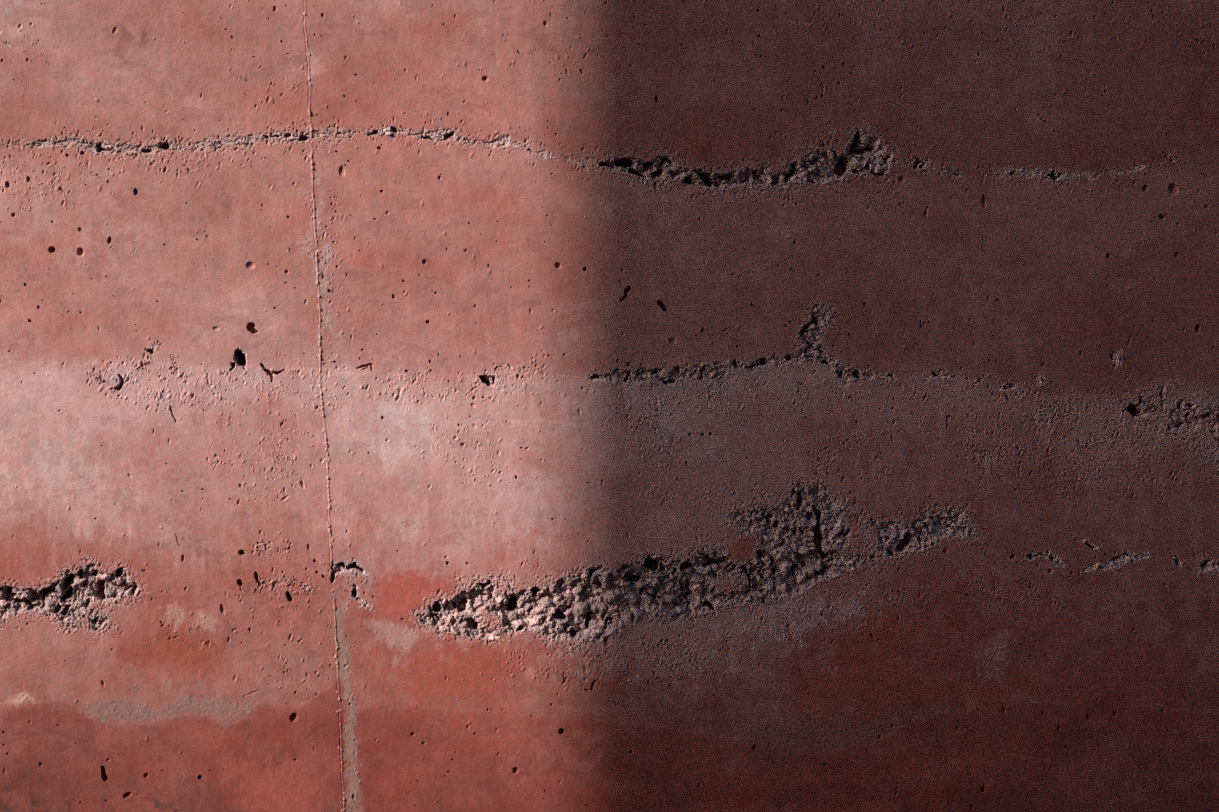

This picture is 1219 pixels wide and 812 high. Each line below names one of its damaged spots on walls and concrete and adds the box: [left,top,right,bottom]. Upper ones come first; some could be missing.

spalling [595,127,895,191]
spalling [1120,384,1219,456]
spalling [364,429,977,688]
spalling [0,562,139,632]